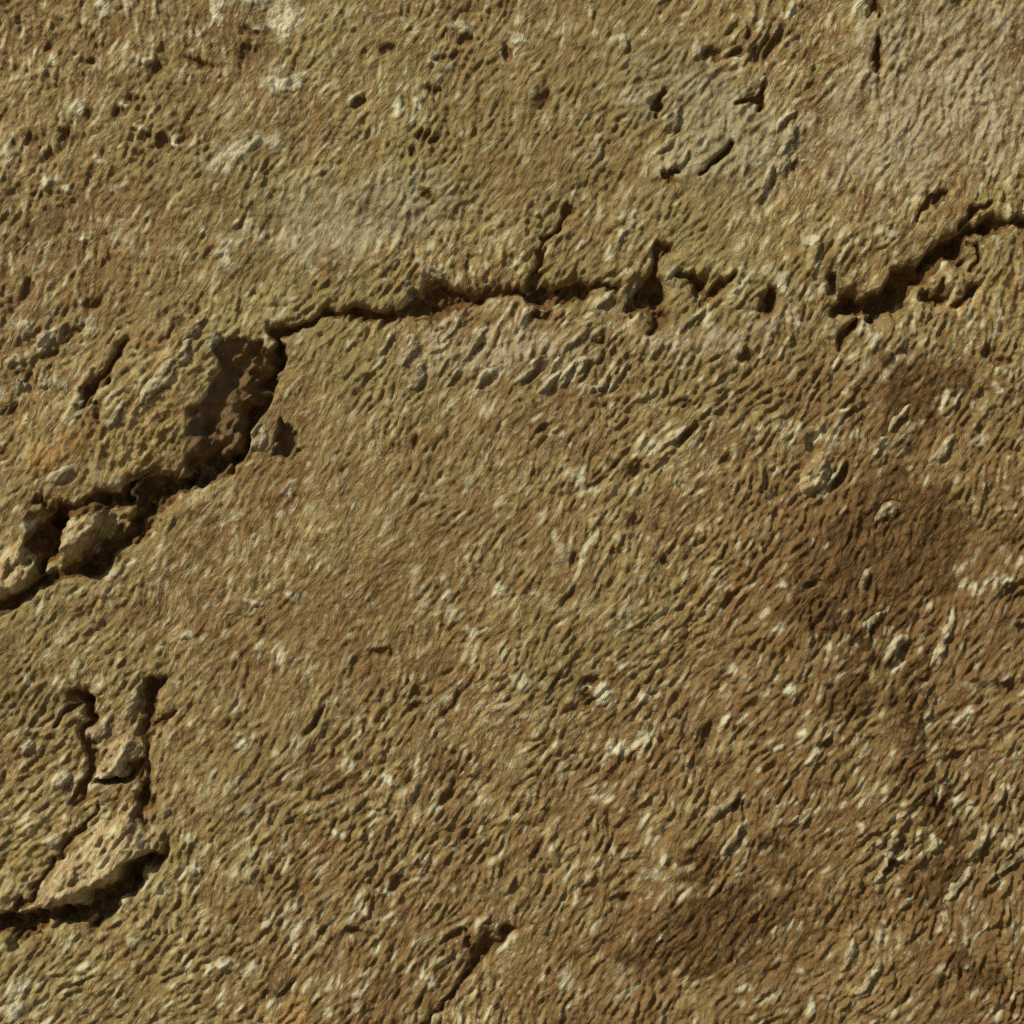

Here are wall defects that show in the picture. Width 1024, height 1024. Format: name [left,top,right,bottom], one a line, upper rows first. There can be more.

crack [867,0,883,73]
crack [917,191,947,222]
crack [80,339,129,424]
peeling [263,332,277,350]
crack [269,202,735,341]
crack [758,287,776,315]
crack [832,201,1024,353]
spalling [249,418,301,459]
crack [0,473,199,617]
crack [0,677,178,949]